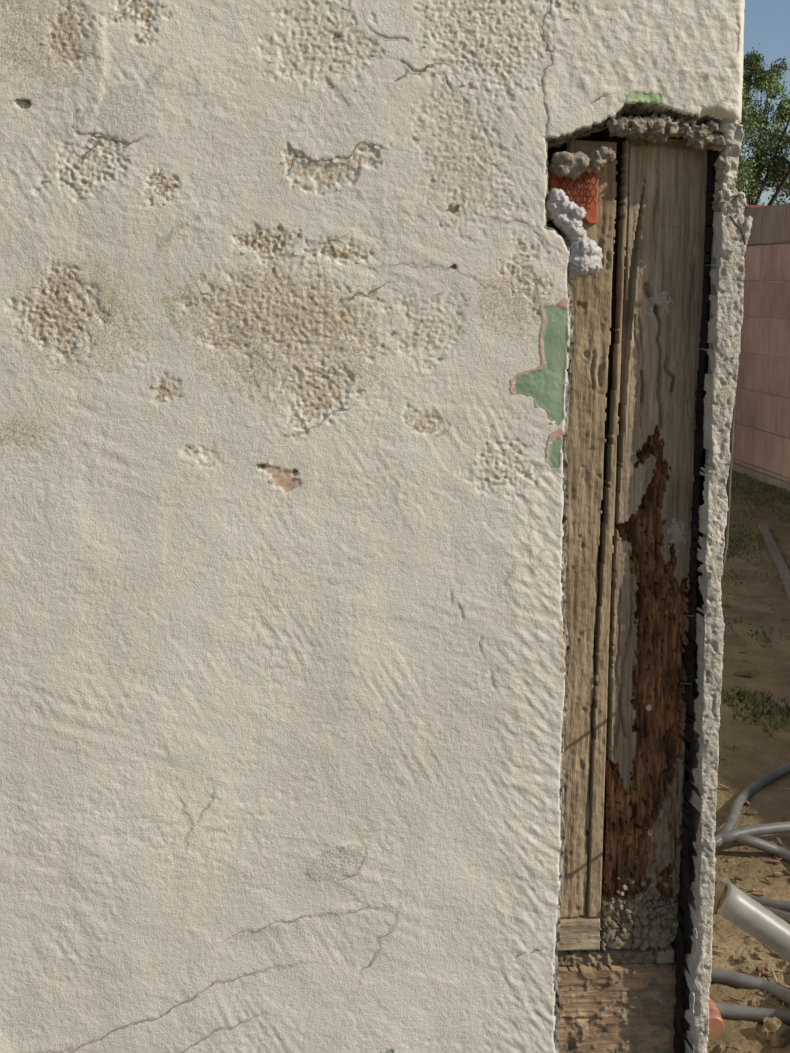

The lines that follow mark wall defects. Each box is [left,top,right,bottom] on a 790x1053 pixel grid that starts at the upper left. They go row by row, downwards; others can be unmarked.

crack [374,31,450,86]
crack [542,0,553,133]
spalling [401,408,449,437]
peeling [257,462,301,493]
spalling [479,90,722,1053]
crack [223,907,397,979]
crack [46,963,307,1053]